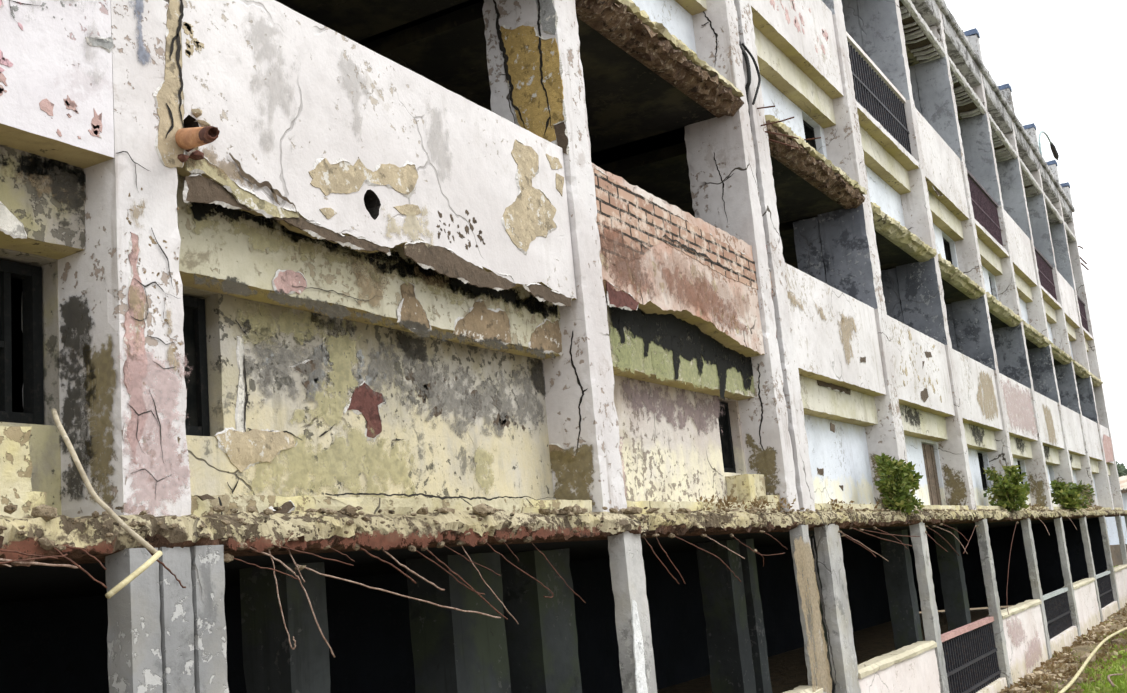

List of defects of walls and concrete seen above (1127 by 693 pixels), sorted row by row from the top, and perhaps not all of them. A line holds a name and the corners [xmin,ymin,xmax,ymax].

mould [0,154,86,227]
peeling [39,95,79,118]
peeling [77,109,102,139]
crack [166,0,184,138]
spalling [152,0,573,356]
crack [493,0,552,136]
flaking render [594,169,775,334]
crack [127,228,179,500]
crack [569,331,588,453]
leakage [609,307,753,434]
spalling [0,544,108,589]
corrosion [0,538,114,560]